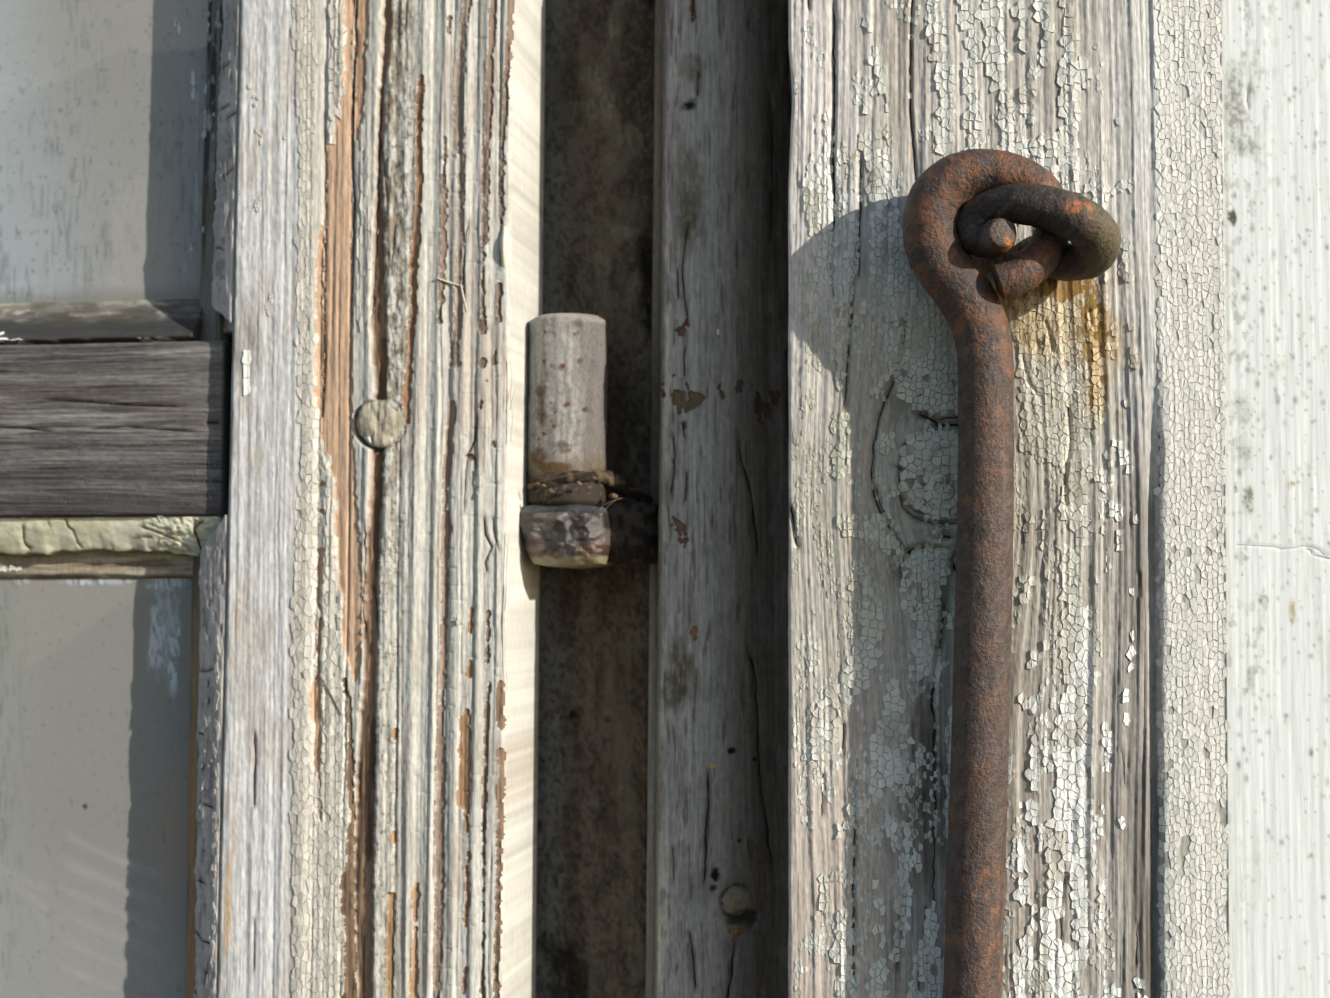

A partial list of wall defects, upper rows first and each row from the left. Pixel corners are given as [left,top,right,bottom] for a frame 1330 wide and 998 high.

crack [132,520,203,550]
peeling [283,0,373,998]
peeling [401,74,425,425]
peeling [384,400,507,998]
peeling [437,0,515,368]
peeling [478,350,497,383]
corrosion [531,386,588,474]
peeling [802,15,958,998]
peeling [925,0,1136,210]
corrosion [1022,278,1107,406]
peeling [1012,293,1148,998]
peeling [1104,232,1136,283]